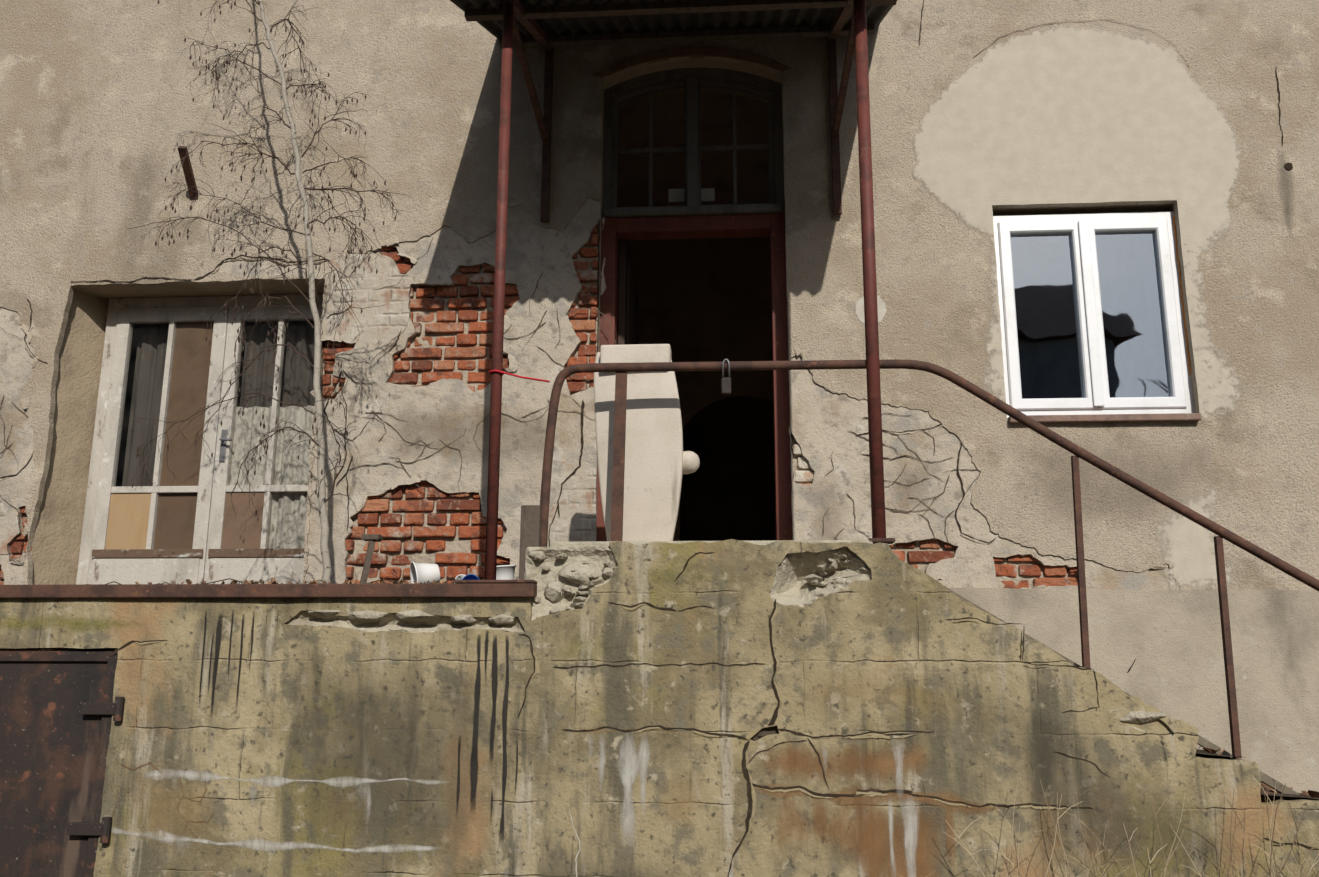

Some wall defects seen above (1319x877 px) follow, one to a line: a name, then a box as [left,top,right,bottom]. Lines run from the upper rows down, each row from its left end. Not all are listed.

crack [919,0,927,45]
flaking render [0,307,39,585]
flaking render [216,198,618,633]
flaking render [769,345,1180,607]
crack [608,552,715,612]
leakage [199,612,278,712]
leakage [457,631,518,838]
leakage [620,741,649,831]
crack [518,599,1100,877]
crack [1057,752,1110,777]
rust [817,810,932,877]
leakage [889,809,917,877]